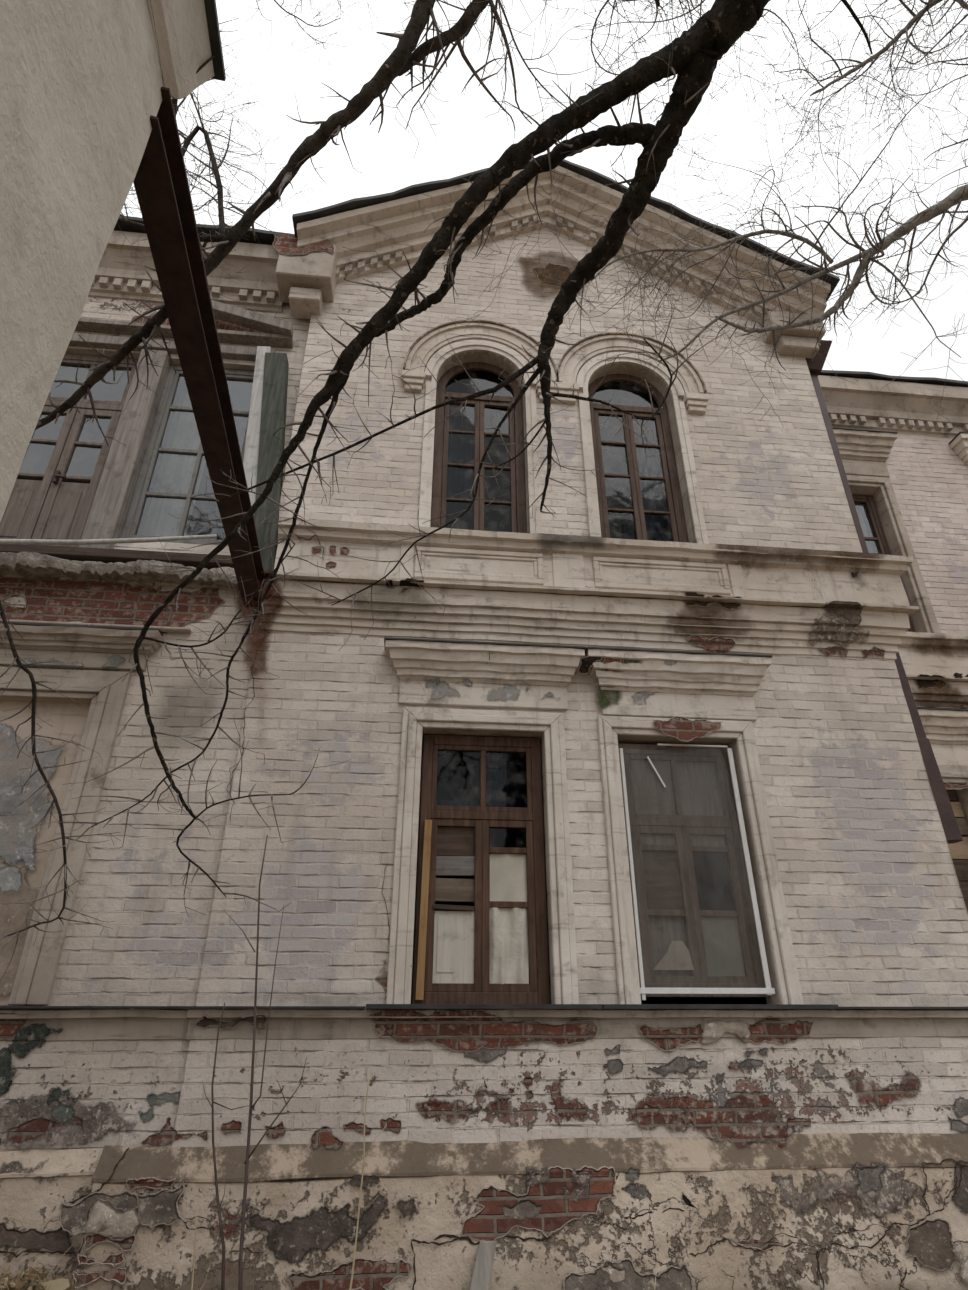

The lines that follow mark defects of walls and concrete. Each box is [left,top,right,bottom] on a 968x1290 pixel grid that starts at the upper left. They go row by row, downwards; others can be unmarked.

rust [236,571,284,674]
flaking render [368,1009,624,1075]
flaking render [637,1016,814,1084]
peeling [0,1087,242,1184]
flaking render [310,1118,401,1150]
peeling [416,1077,534,1124]
peeling [631,1091,811,1148]
peeling [241,1175,417,1290]
crack [411,1234,551,1290]
crack [624,1208,685,1219]
crack [690,1158,968,1290]
flaking render [905,1217,968,1284]